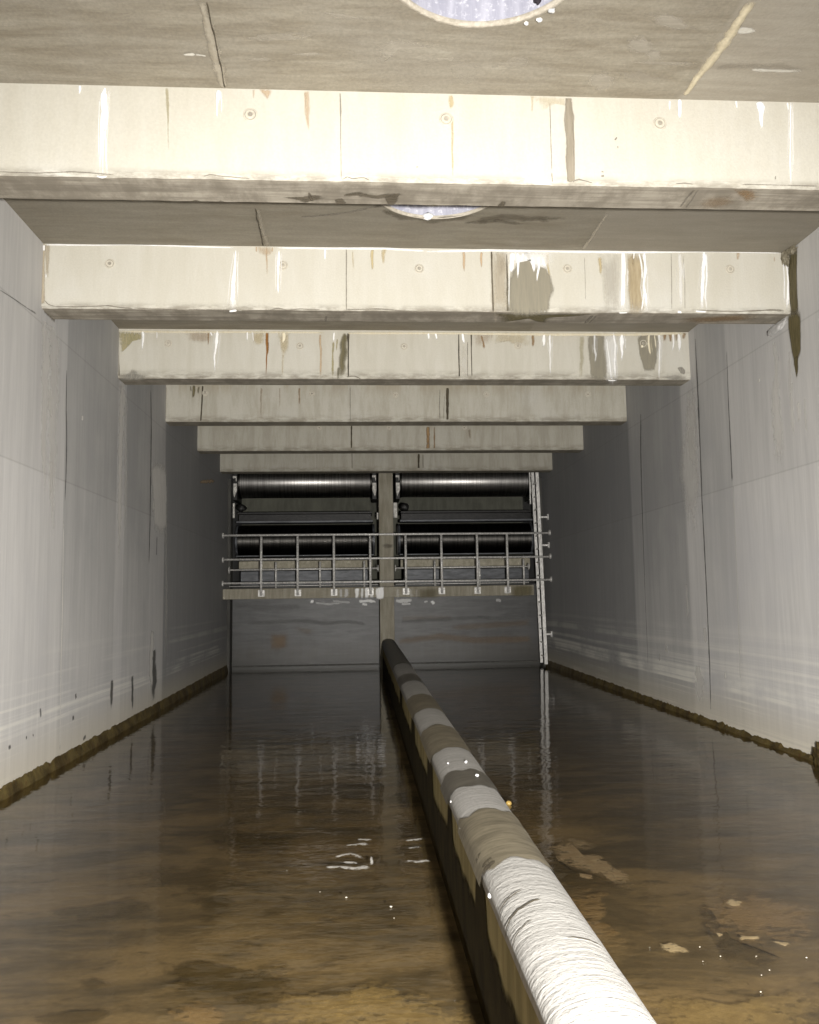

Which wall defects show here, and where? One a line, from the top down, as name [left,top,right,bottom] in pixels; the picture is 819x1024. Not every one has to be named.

crack [207,4,225,87]
rust [564,98,575,182]
water stain [287,193,320,202]
water stain [275,247,688,314]
water stain [783,264,791,305]
water stain [128,330,681,381]